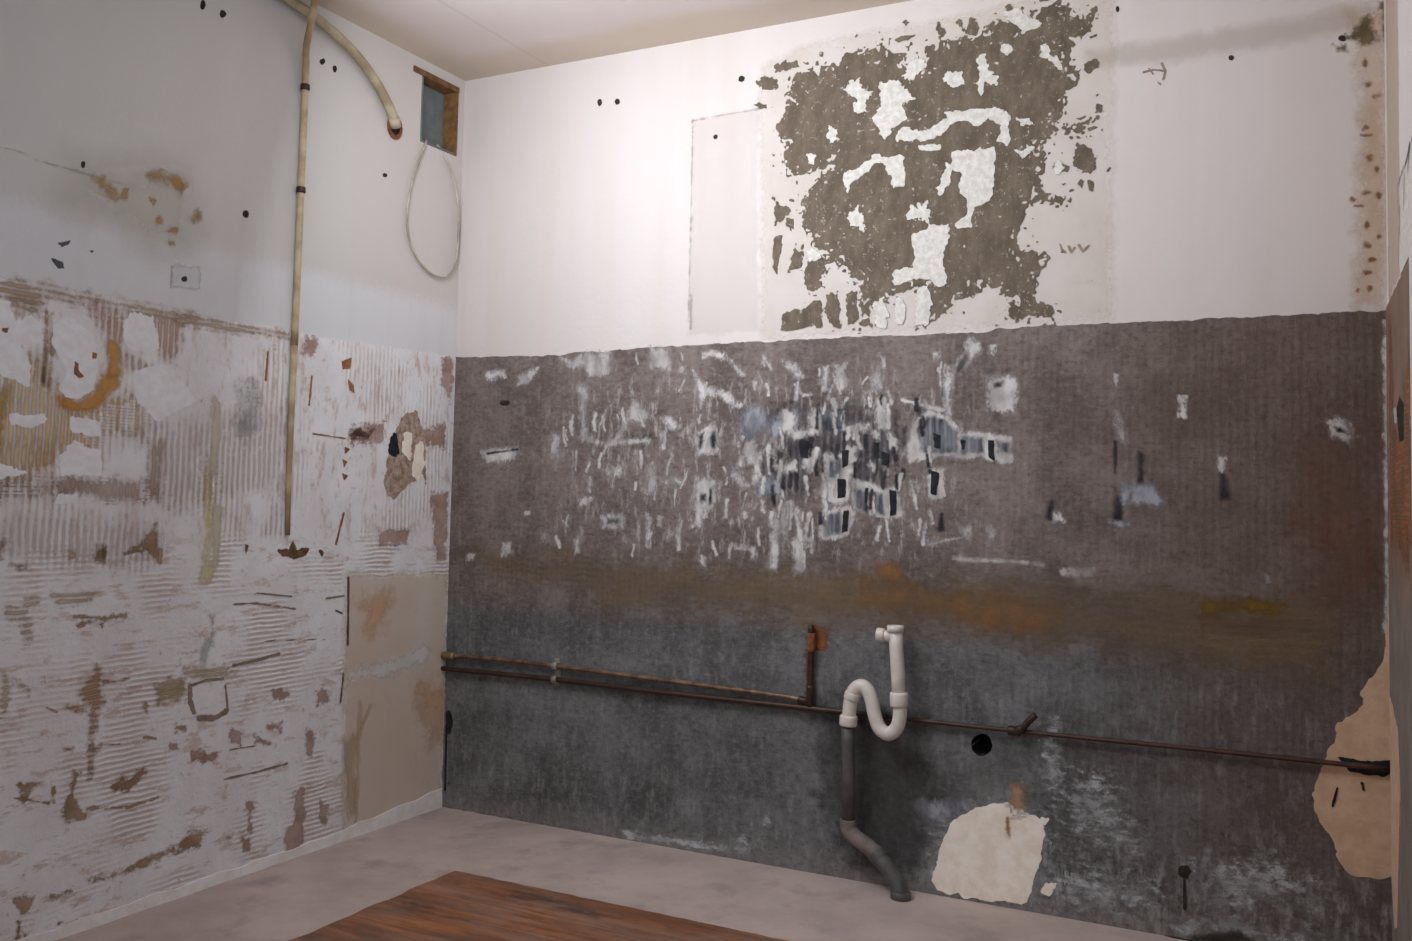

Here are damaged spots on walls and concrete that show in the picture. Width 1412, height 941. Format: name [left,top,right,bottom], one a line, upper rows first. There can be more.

corrosion [1351,0,1400,301]
flaking render [541,0,1111,572]
peeling [0,300,98,399]
peeling [123,312,197,421]
spalling [342,357,354,393]
peeling [58,416,102,476]
spalling [313,433,350,480]
flaking render [384,410,427,499]
flaking render [277,512,345,560]
flaking render [1312,320,1404,929]
spalling [187,677,229,722]
spalling [89,830,202,882]